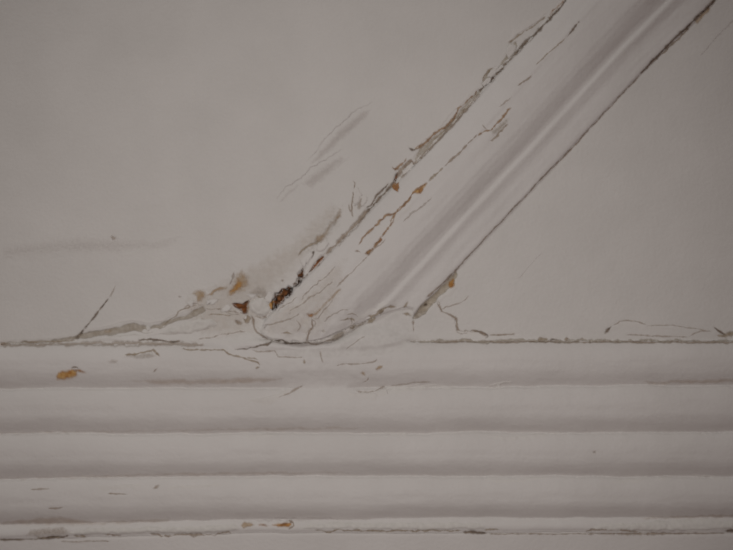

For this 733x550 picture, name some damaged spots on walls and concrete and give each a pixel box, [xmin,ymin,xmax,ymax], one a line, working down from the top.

flaking render [391,87,480,191]
crack [457,0,715,269]
crack [3,0,566,368]
peeling [357,183,426,254]
flaking render [1,240,329,345]
flaking render [332,303,394,340]
flaking render [404,269,459,331]
crack [410,298,733,344]
rust [57,367,83,379]